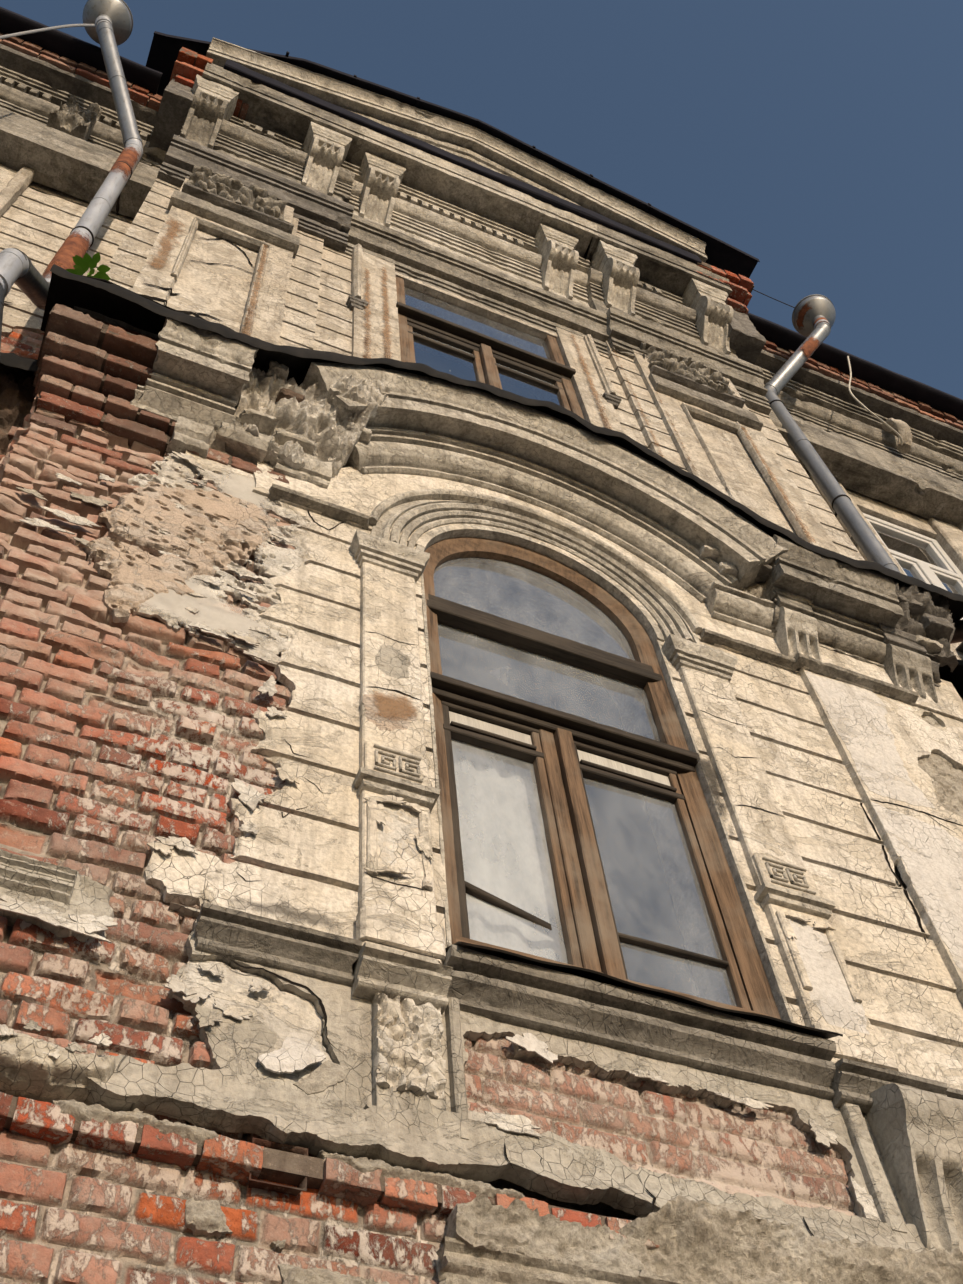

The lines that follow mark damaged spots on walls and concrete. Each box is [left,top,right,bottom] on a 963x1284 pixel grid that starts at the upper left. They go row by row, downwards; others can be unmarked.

rust [107,147,139,178]
rust [42,232,91,278]
flaking render [0,396,349,1095]
flaking render [361,694,416,731]
flaking render [375,645,411,678]
flaking render [806,672,963,972]
crack [860,799,963,943]
crack [230,959,343,1054]
flaking render [784,912,870,1035]
flaking render [150,1114,317,1158]
flaking render [464,1033,882,1222]
flaking render [0,1129,449,1284]